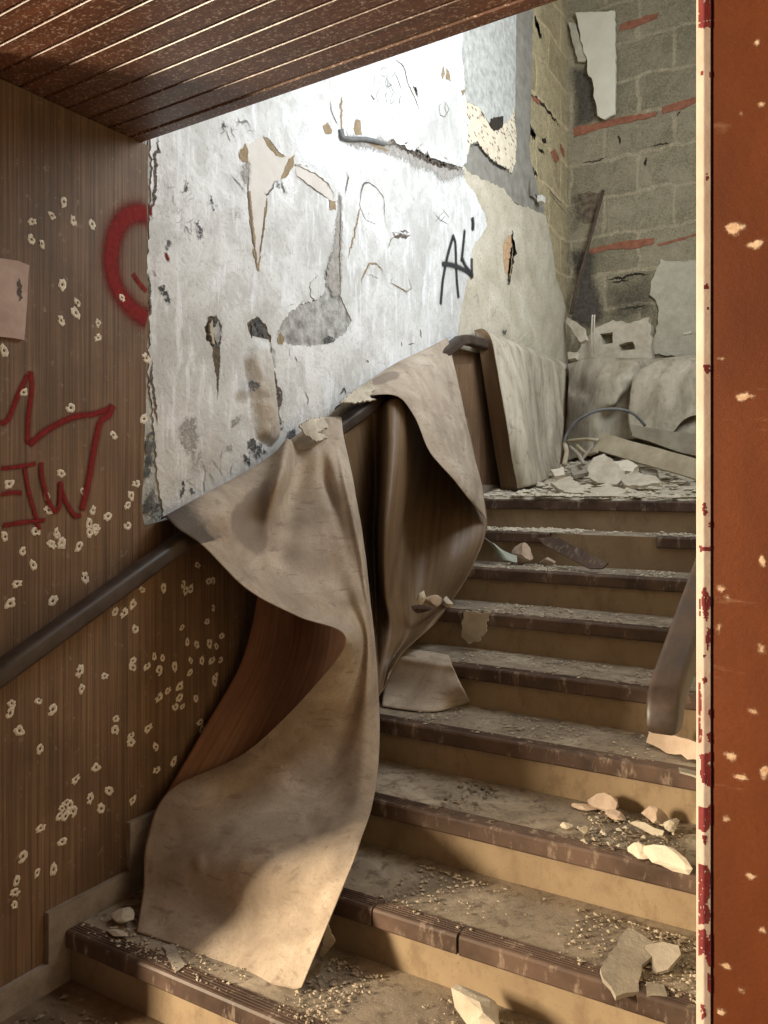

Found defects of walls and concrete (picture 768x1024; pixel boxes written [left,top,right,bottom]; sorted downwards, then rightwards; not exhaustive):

spalling [619,13,659,31]
spalling [461,89,517,174]
spalling [573,97,696,137]
flaking render [233,95,362,423]
spalling [503,231,517,284]
spalling [590,233,696,254]
flaking render [204,316,222,400]
spalling [577,317,655,361]